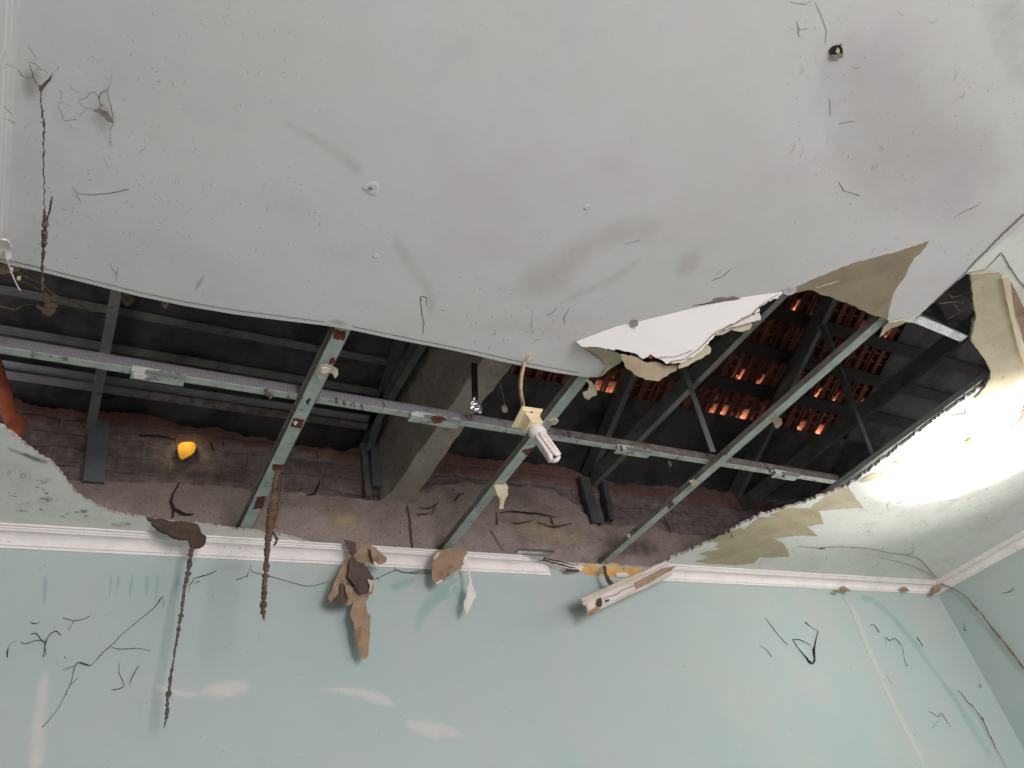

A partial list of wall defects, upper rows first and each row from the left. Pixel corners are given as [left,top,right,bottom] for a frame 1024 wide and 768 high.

spalling [0,262,21,275]
peeling [795,241,929,319]
rust [252,496,267,510]
peeling [695,471,907,566]